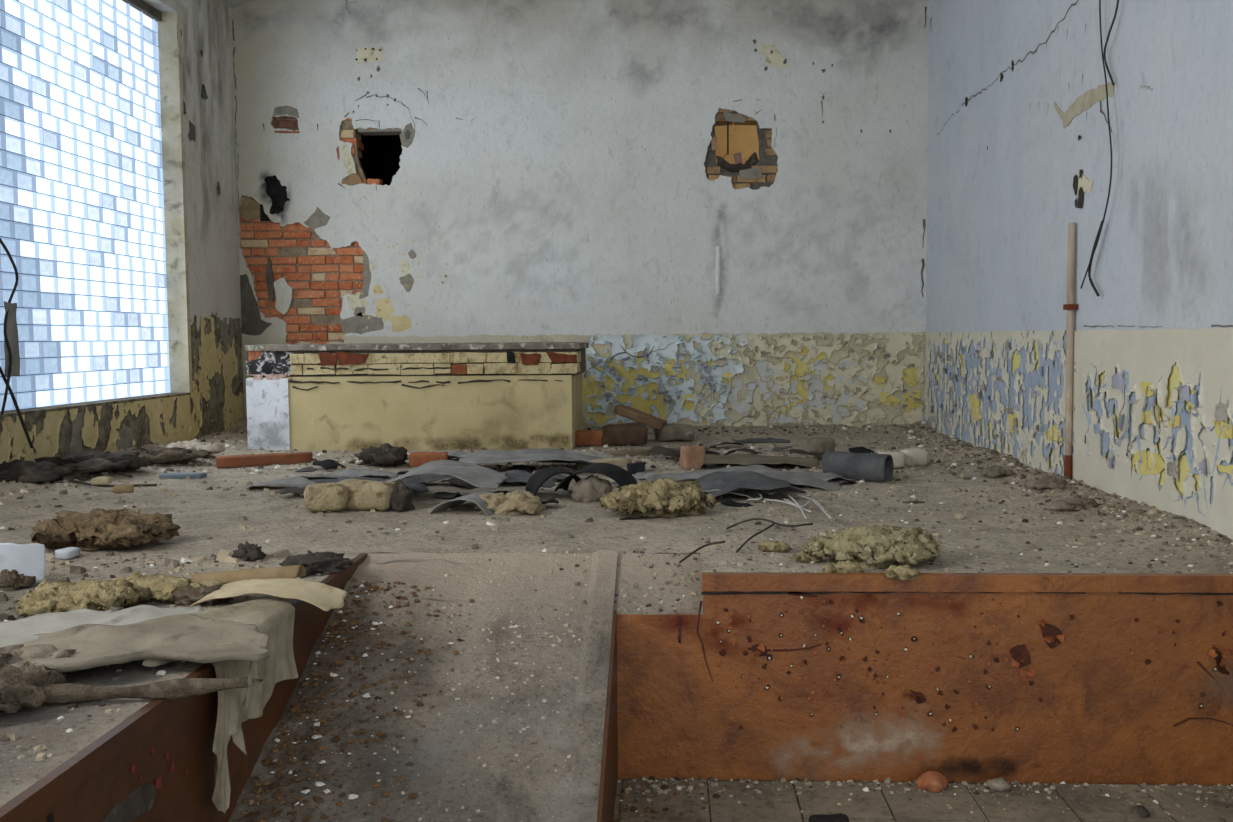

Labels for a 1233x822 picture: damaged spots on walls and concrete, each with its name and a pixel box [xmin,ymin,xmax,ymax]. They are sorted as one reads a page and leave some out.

crack [936,0,1078,137]
peeling [183,101,196,141]
spalling [336,47,415,186]
spalling [704,108,778,190]
peeling [0,175,442,464]
peeling [507,328,1233,573]
peeling [709,596,1084,732]
peeling [1206,631,1233,675]
spalling [916,771,949,793]
corrosion [938,761,1014,774]
spalling [986,777,1012,792]